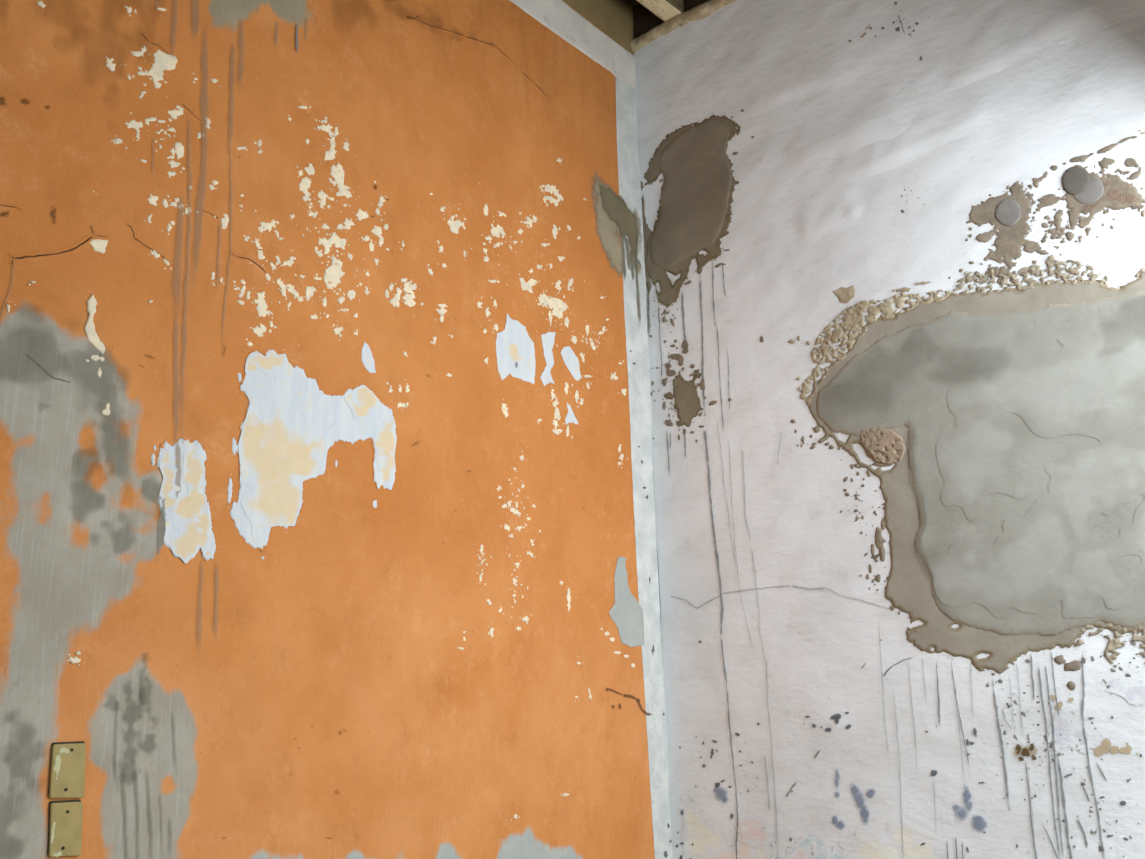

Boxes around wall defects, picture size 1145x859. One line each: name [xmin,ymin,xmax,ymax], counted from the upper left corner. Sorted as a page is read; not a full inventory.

peeling [105,45,177,98]
crack [182,103,201,122]
crack [410,16,549,98]
crack [28,355,70,382]
crack [0,223,168,317]
crack [228,251,267,274]
peeling [211,105,410,559]
peeling [463,184,636,438]
spalling [788,130,1145,406]
peeling [151,437,217,563]
peeling [1054,623,1145,690]
peeling [428,814,588,859]